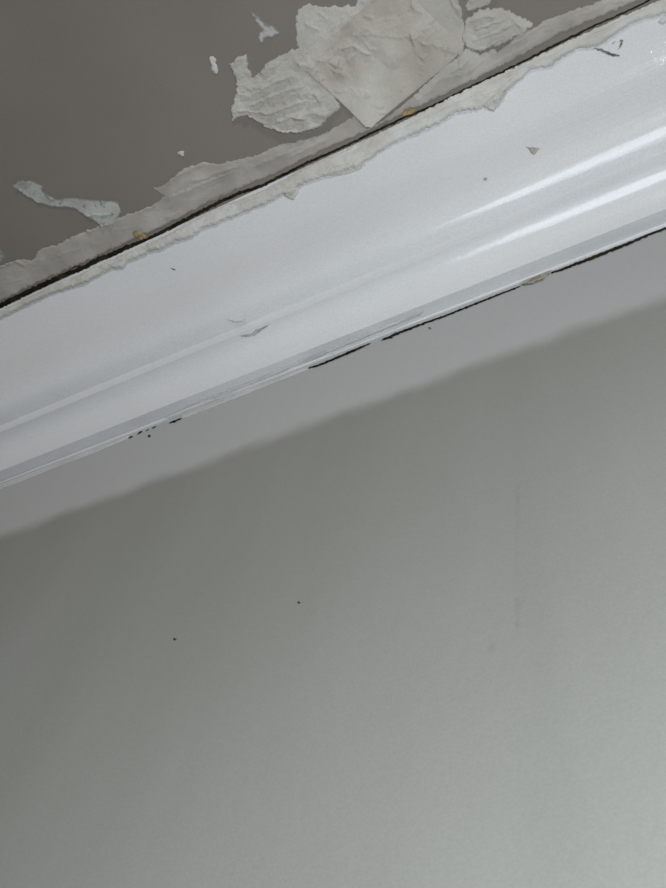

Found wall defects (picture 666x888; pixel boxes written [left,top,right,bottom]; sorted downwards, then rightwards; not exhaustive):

peeling [484,91,507,112]
crack [0,0,666,309]
peeling [327,162,365,176]
peeling [519,271,553,286]